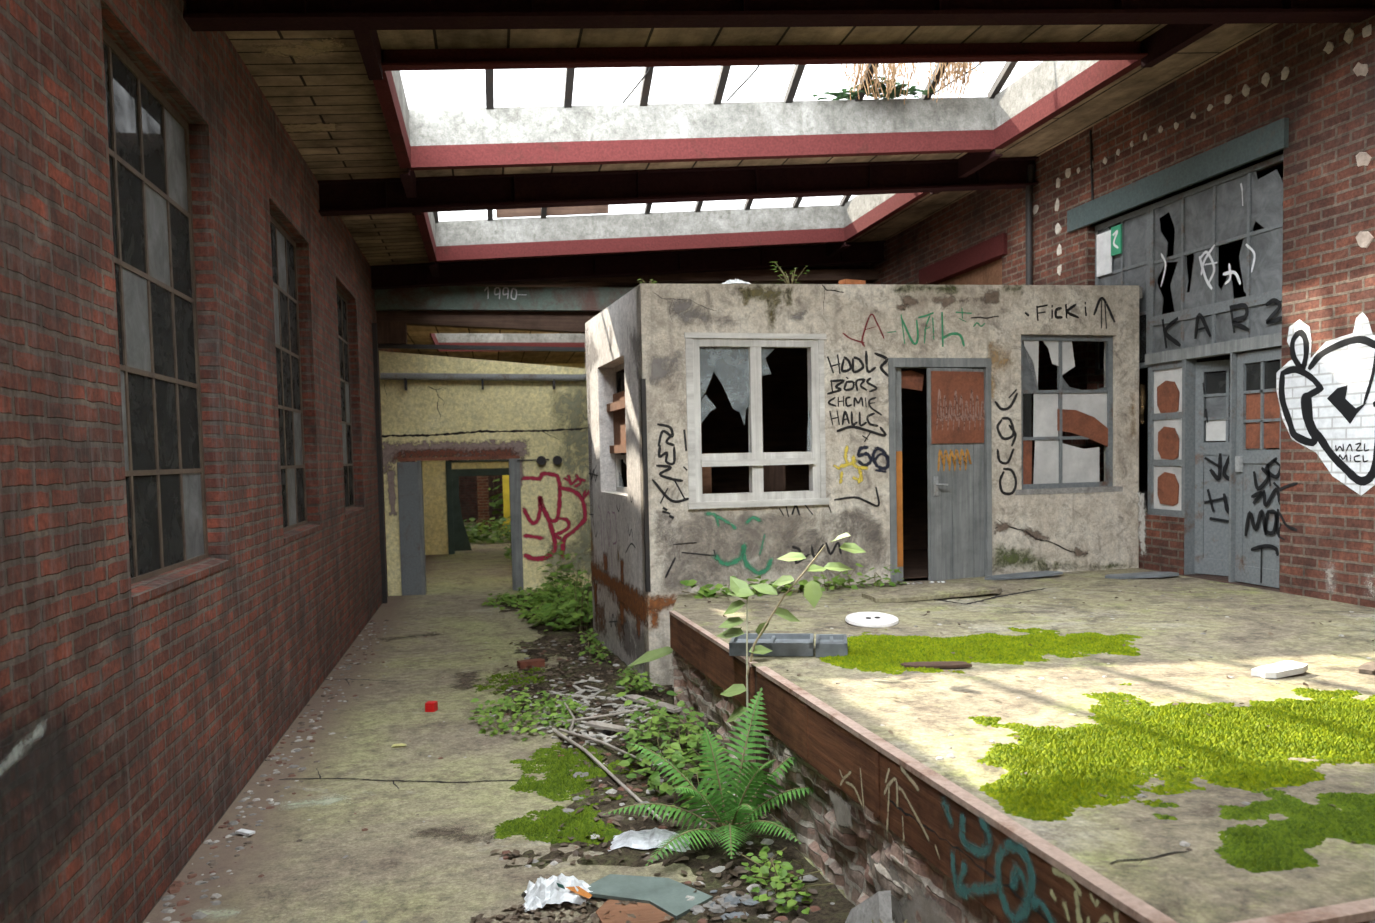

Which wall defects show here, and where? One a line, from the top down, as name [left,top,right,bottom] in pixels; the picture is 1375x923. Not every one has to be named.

leakage [672,300,731,323]
leakage [738,285,804,323]
leakage [632,333,681,385]
crack [994,520,1088,557]
crack [934,588,1045,604]